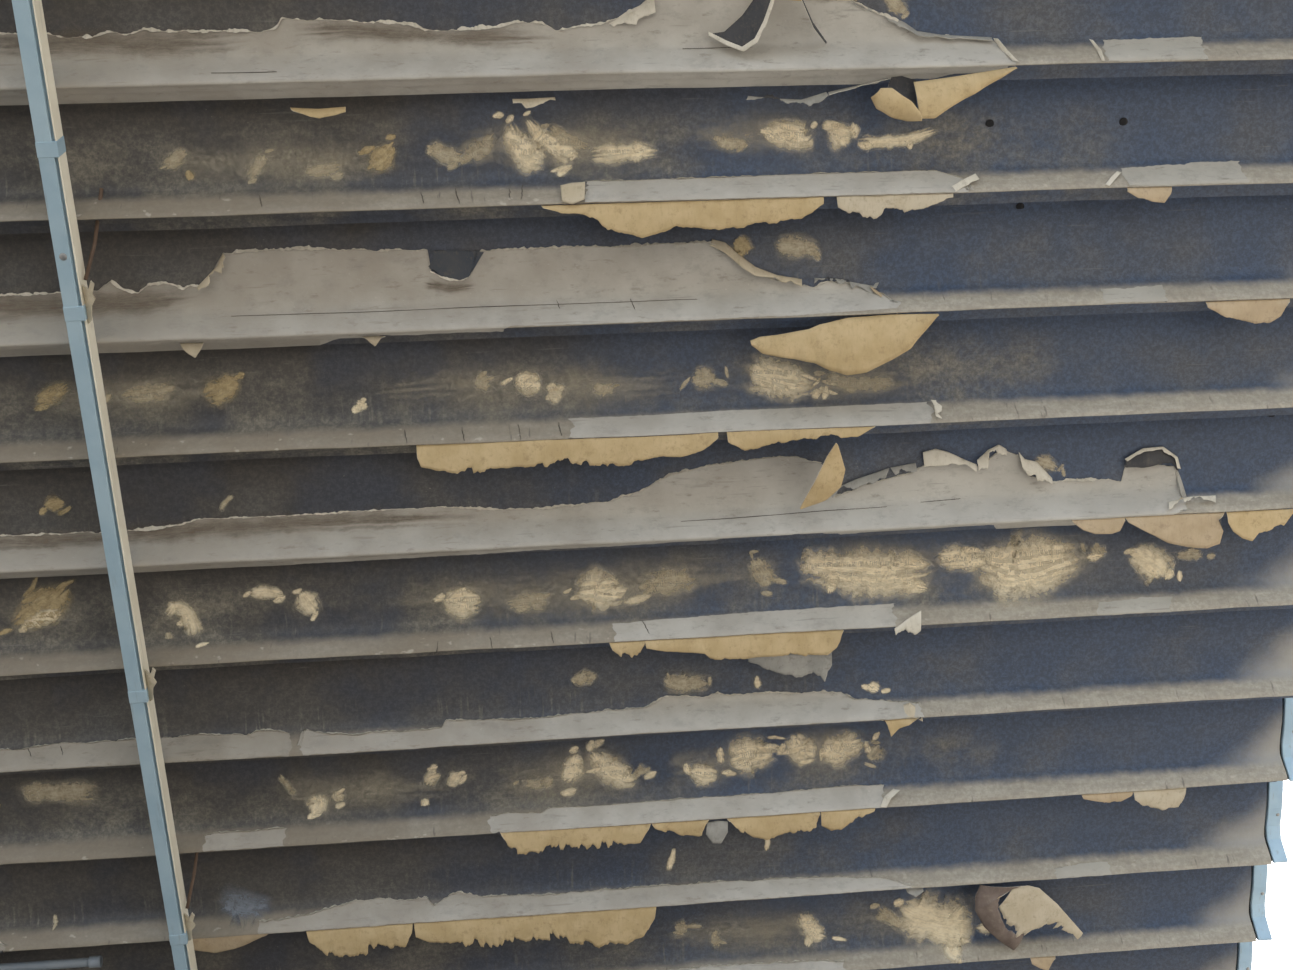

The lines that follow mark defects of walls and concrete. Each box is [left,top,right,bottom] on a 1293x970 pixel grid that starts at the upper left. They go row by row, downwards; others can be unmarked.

peeling [47,0,1019,121]
peeling [92,170,979,375]
peeling [0,292,71,357]
peeling [1206,299,1290,324]
peeling [127,400,1293,573]
peeling [0,531,108,579]
peeling [160,603,924,763]
peeling [0,738,140,772]
peeling [487,784,900,855]
peeling [1082,788,1186,810]
peeling [258,876,923,957]
peeling [975,885,1083,950]